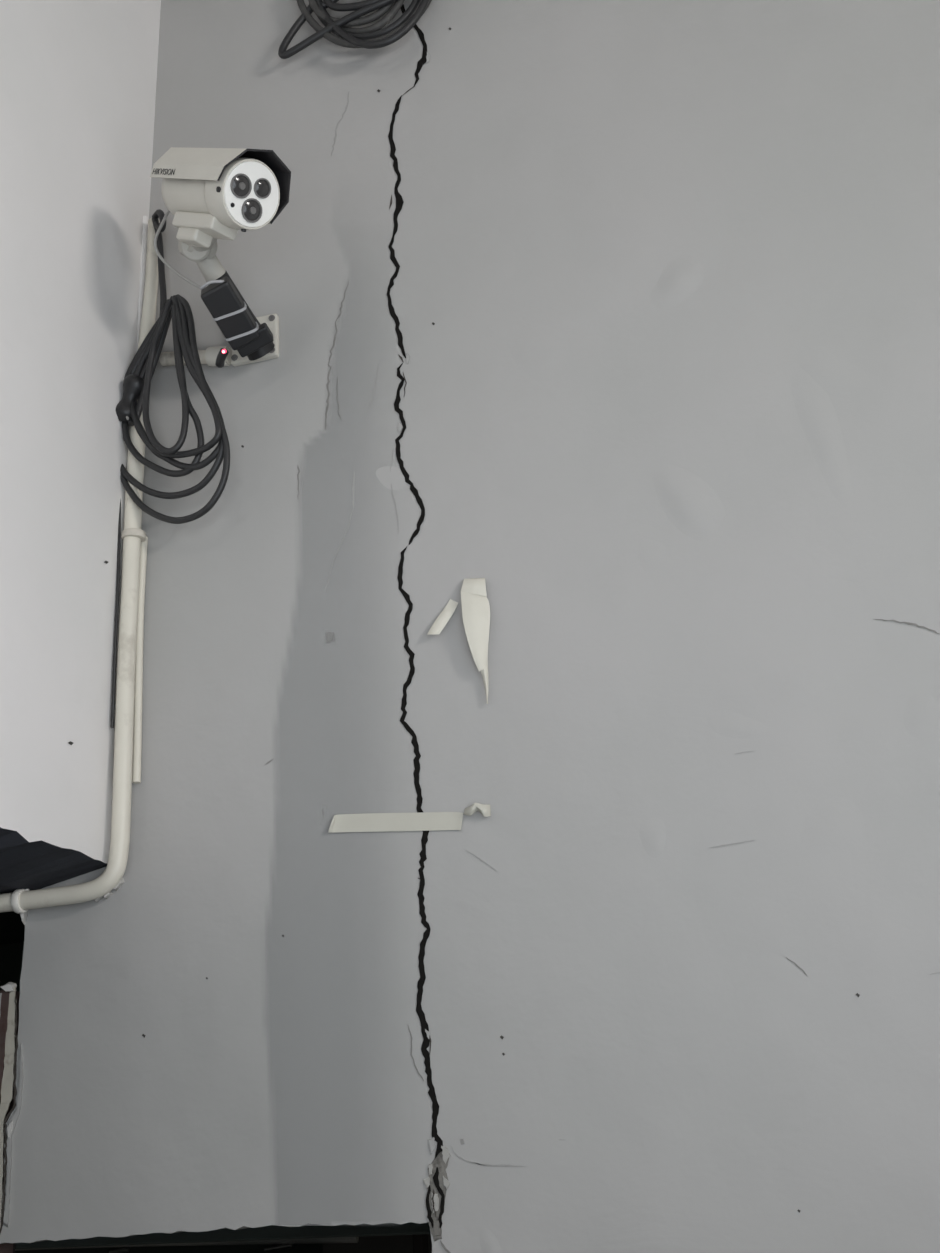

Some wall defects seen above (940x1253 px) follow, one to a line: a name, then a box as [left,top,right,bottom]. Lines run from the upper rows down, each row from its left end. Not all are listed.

crack [325,282,349,429]
crack [387,4,528,1167]
spalling [424,1137,464,1253]